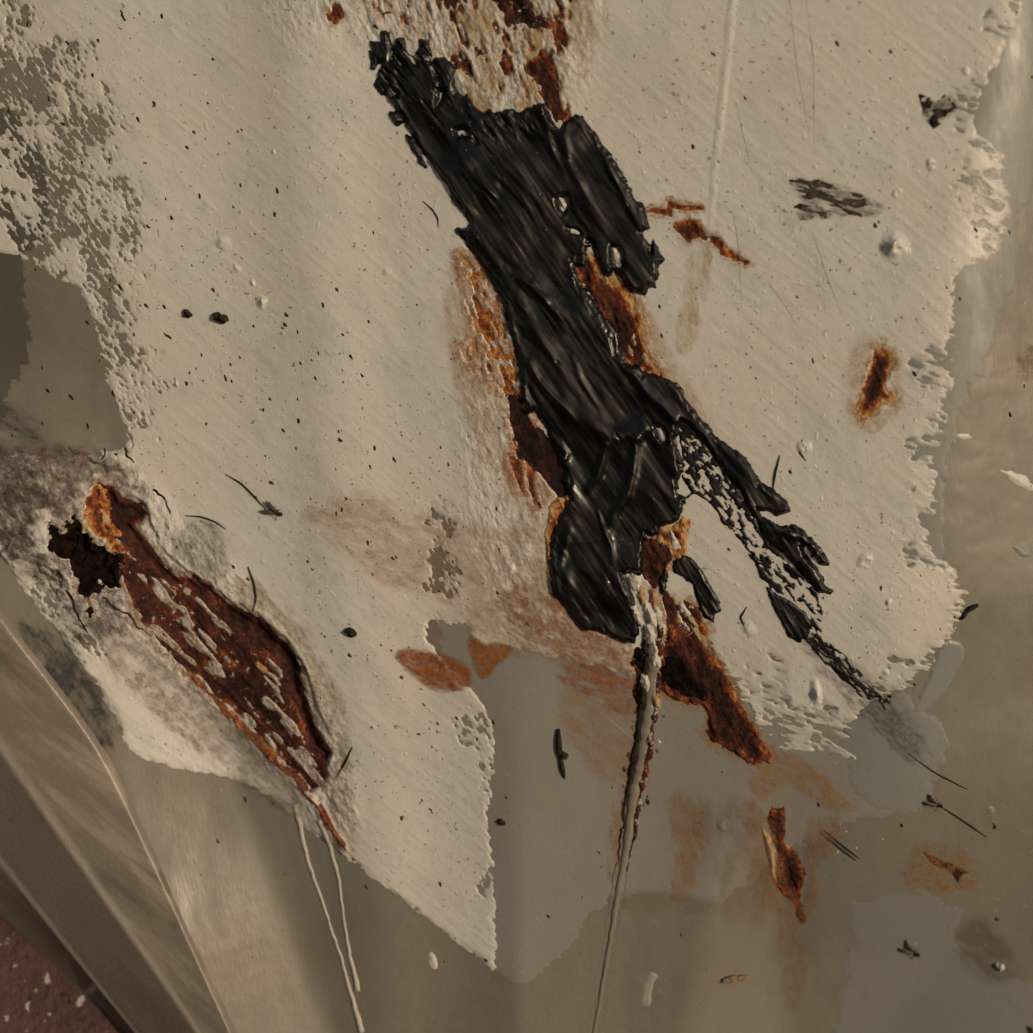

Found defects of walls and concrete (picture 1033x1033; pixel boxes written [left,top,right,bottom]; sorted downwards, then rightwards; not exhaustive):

rust [325,0,344,25]
rust [426,0,591,123]
spalling [918,94,957,129]
rust [575,251,668,378]
rust [853,343,901,423]
rust [452,249,636,714]
rust [96,482,331,761]
rust [396,637,511,691]
peeling [640,608,662,708]
rust [627,515,776,766]
rust [186,670,355,861]